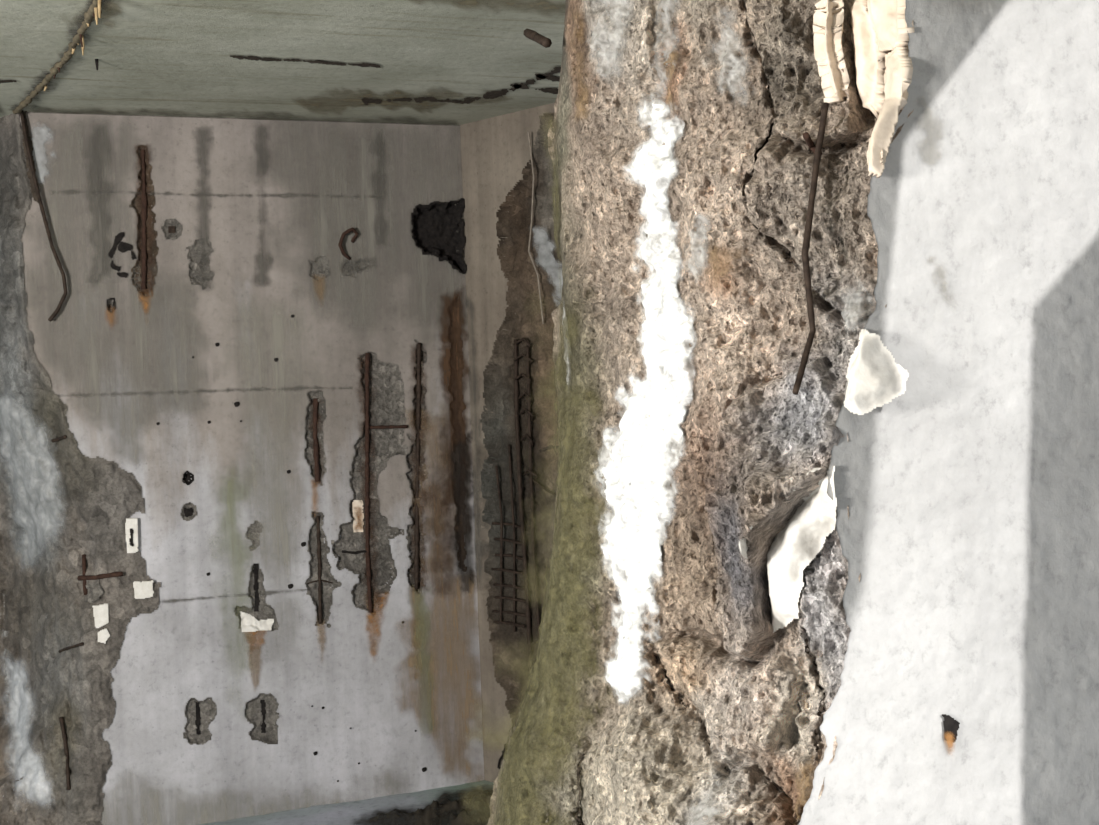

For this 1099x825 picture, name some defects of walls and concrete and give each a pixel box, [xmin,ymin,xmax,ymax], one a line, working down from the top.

water stain [452,0,565,11]
crack [741,80,866,200]
hole [411,198,467,274]
crack [753,225,831,304]
efflorescence [598,0,708,702]
spalling [0,110,161,825]
spalling [304,339,429,655]
corrosion [404,293,488,781]
spalling [480,0,909,825]
spalling [183,697,217,745]
crack [654,655,727,770]
crack [800,633,826,752]